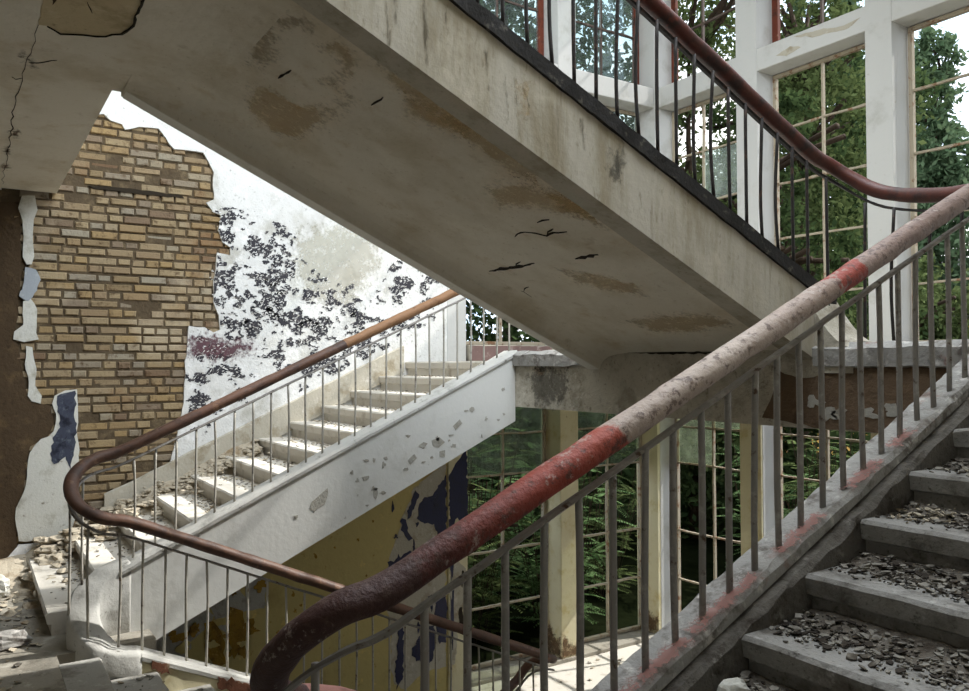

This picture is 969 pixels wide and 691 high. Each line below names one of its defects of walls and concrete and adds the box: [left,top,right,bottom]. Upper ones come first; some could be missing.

spalling [38,0,145,38]
crack [2,25,57,182]
flaking render [0,114,439,559]
leakage [531,366,568,410]
peeling [350,407,475,568]
peeling [387,562,466,690]